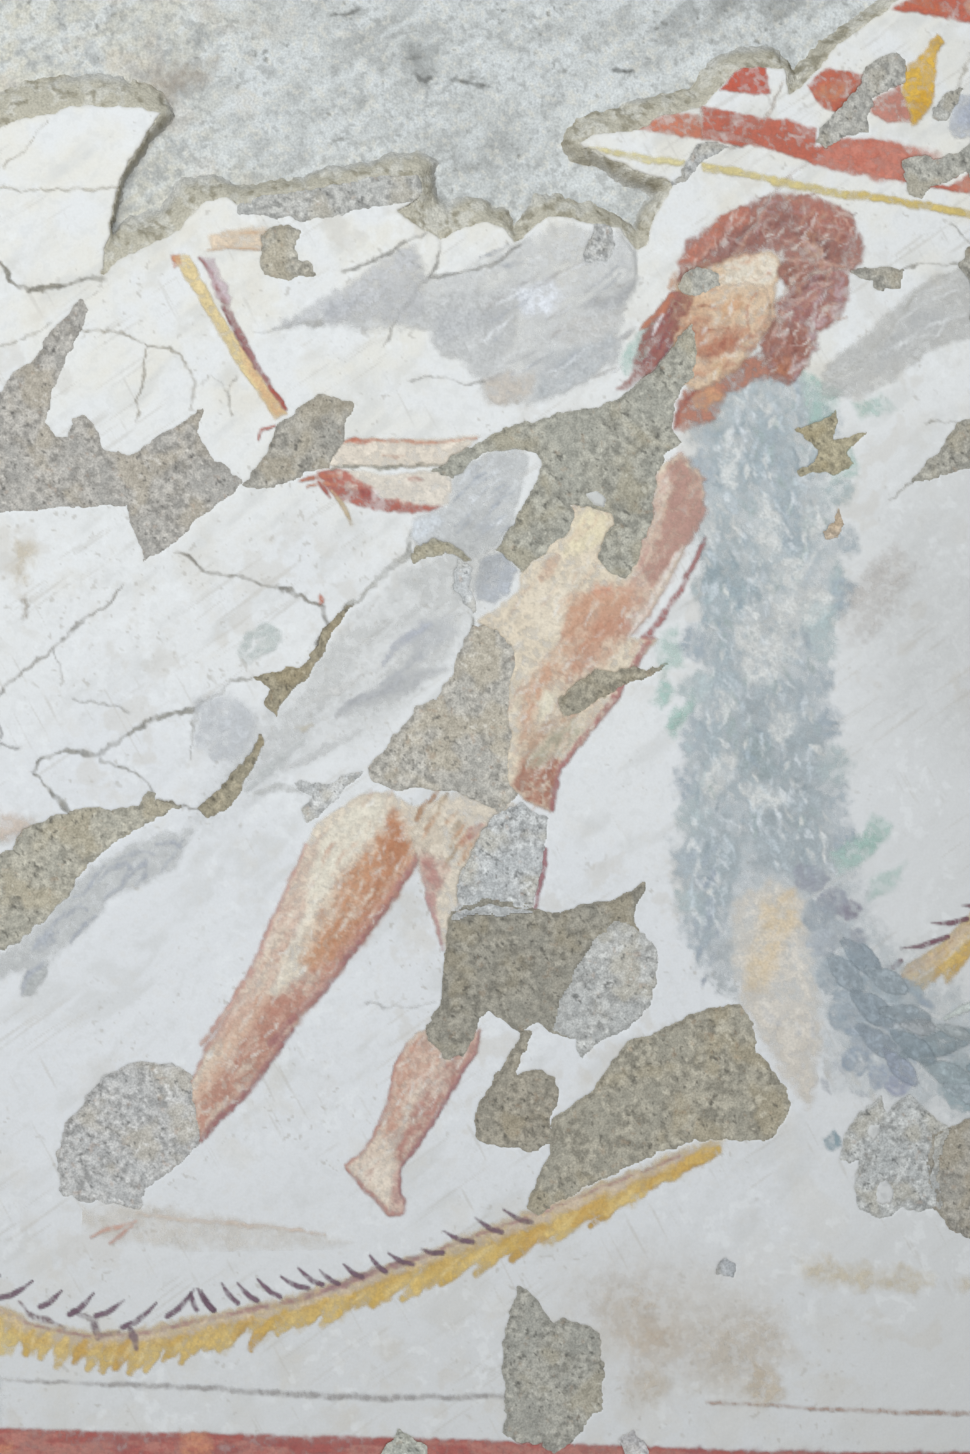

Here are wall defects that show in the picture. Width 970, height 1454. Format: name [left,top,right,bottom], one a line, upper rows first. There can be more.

spalling [0,0,907,281]
crack [0,262,84,291]
spalling [0,299,354,562]
spalling [431,324,697,578]
crack [279,542,411,646]
crack [0,727,84,811]
spalling [0,734,264,950]
crack [117,708,194,767]
spalling [294,538,791,1216]
spalling [56,1061,200,1210]
spalling [840,1094,970,1239]
spalling [502,1286,605,1454]